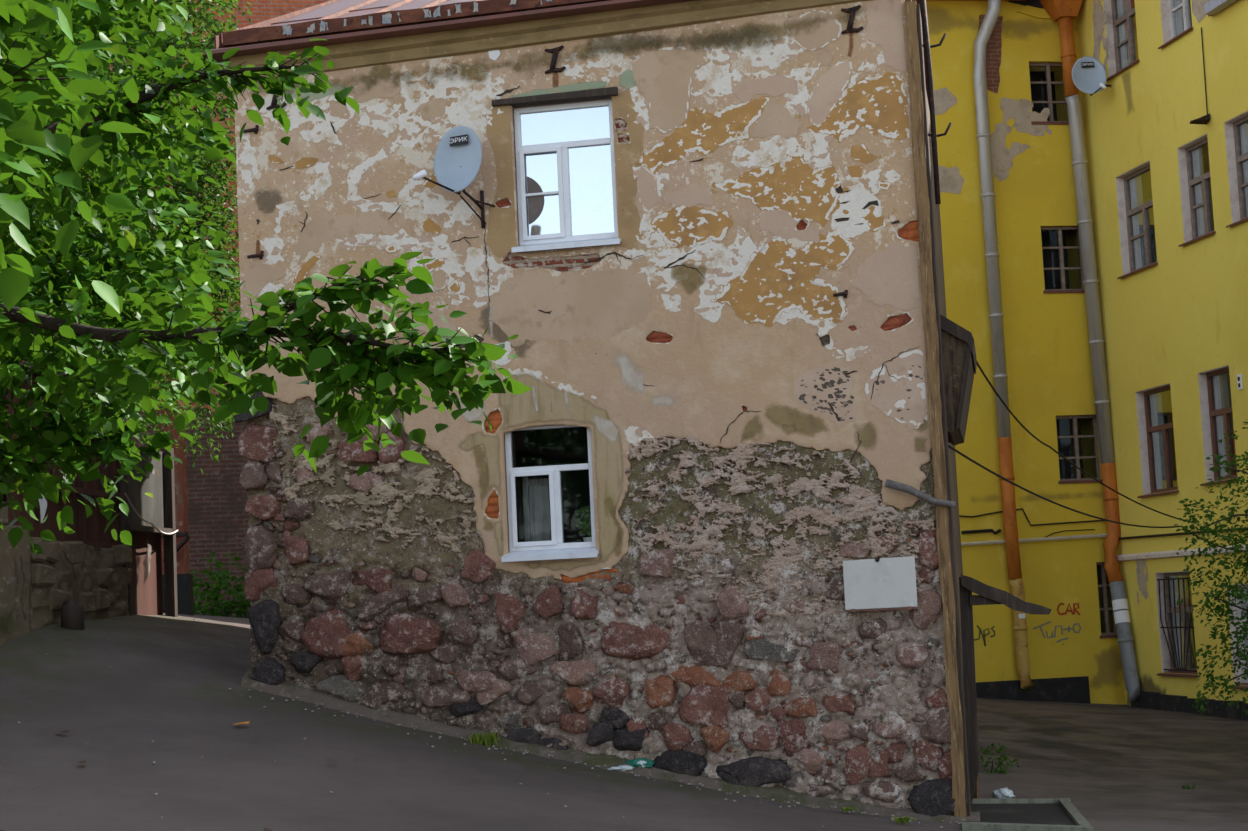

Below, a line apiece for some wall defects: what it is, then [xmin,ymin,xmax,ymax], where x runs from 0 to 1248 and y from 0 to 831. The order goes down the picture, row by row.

damp [257,191,281,213]
peeling [236,50,601,308]
peeling [560,34,928,430]
peeling [977,15,1052,182]
crack [829,404,861,463]
crack [844,346,920,399]
flaking render [232,391,955,817]